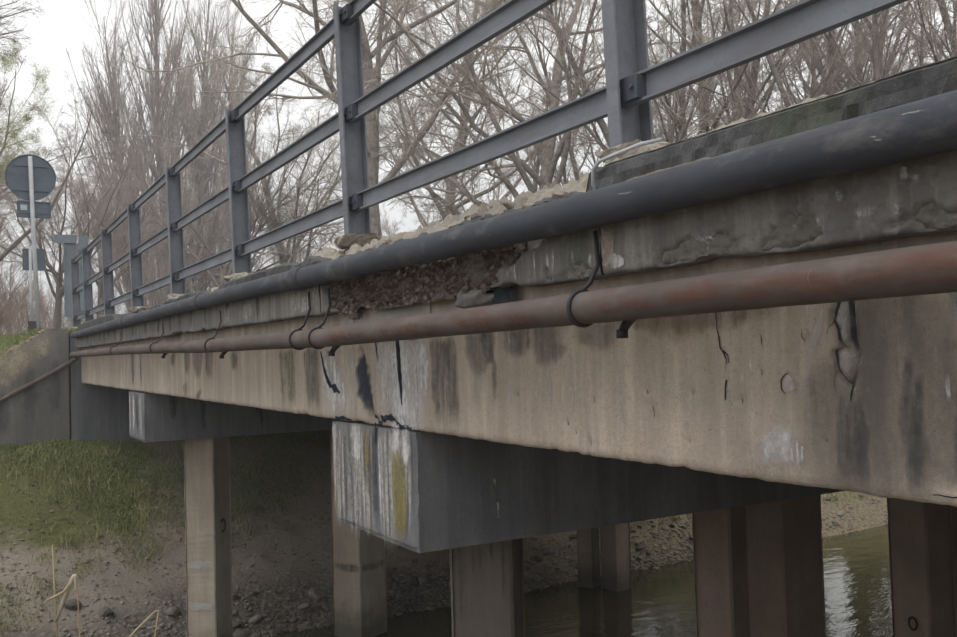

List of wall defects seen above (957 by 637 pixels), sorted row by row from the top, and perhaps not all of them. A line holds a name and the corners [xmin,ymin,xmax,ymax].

spalling [324,242,526,319]
crack [949,292,957,323]
crack [320,350,351,420]
crack [374,341,412,439]
crack [715,313,729,400]
crack [827,301,859,402]
damp [280,340,455,532]